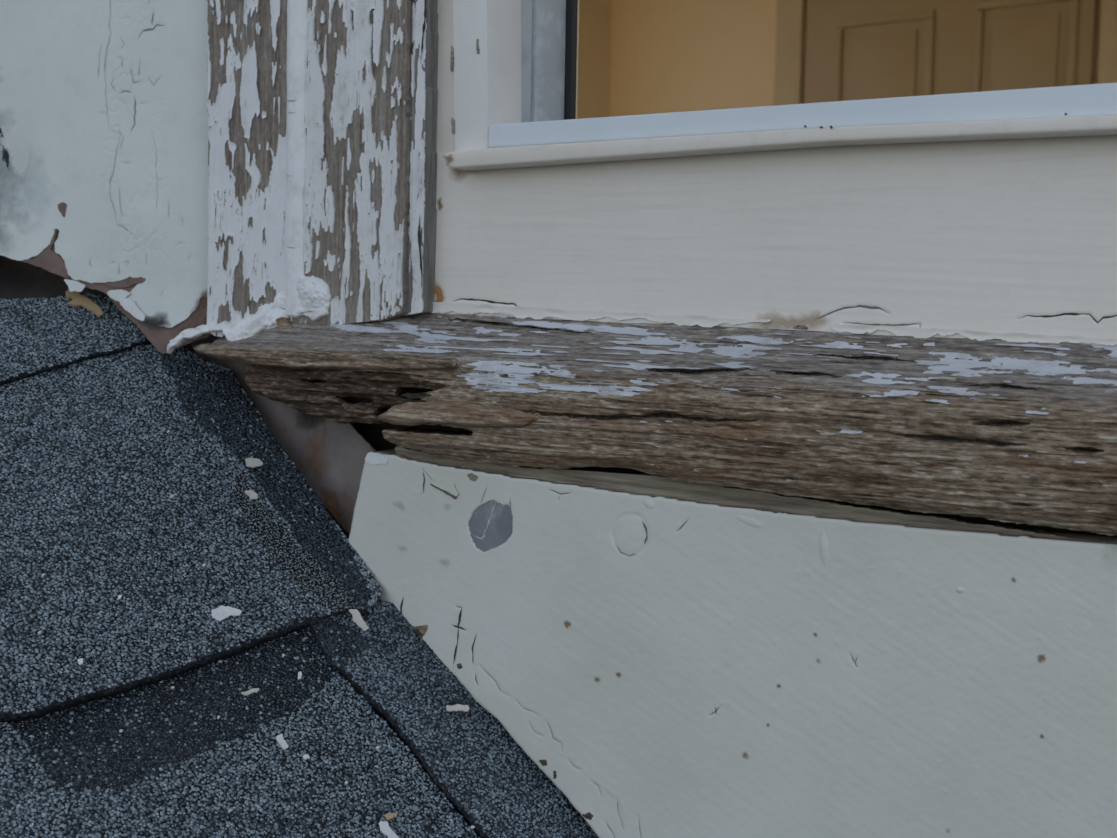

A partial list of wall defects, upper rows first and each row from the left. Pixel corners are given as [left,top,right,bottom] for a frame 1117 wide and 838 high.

crack [98,0,190,259]
peeling [207,0,286,337]
peeling [303,0,1117,404]
peeling [22,202,85,292]
peeling [104,277,146,321]
crack [819,305,921,326]
crack [1018,313,1117,323]
peeling [245,457,263,468]
spalling [365,452,388,465]
peeling [468,500,513,552]